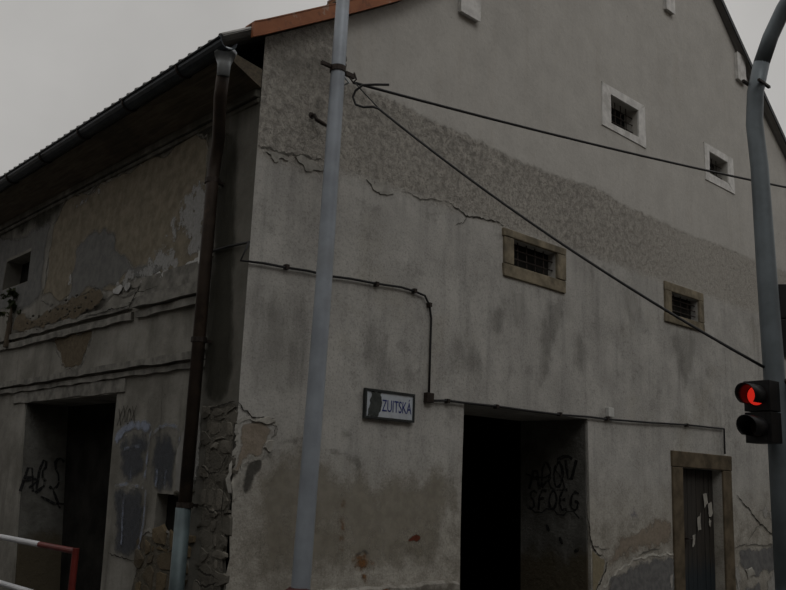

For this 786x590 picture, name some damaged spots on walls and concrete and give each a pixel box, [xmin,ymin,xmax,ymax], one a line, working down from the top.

flaking render [41,133,210,308]
crack [408,192,503,226]
flaking render [53,329,94,371]
flaking render [185,401,279,590]
flaking render [109,524,173,590]
flaking render [602,519,675,590]